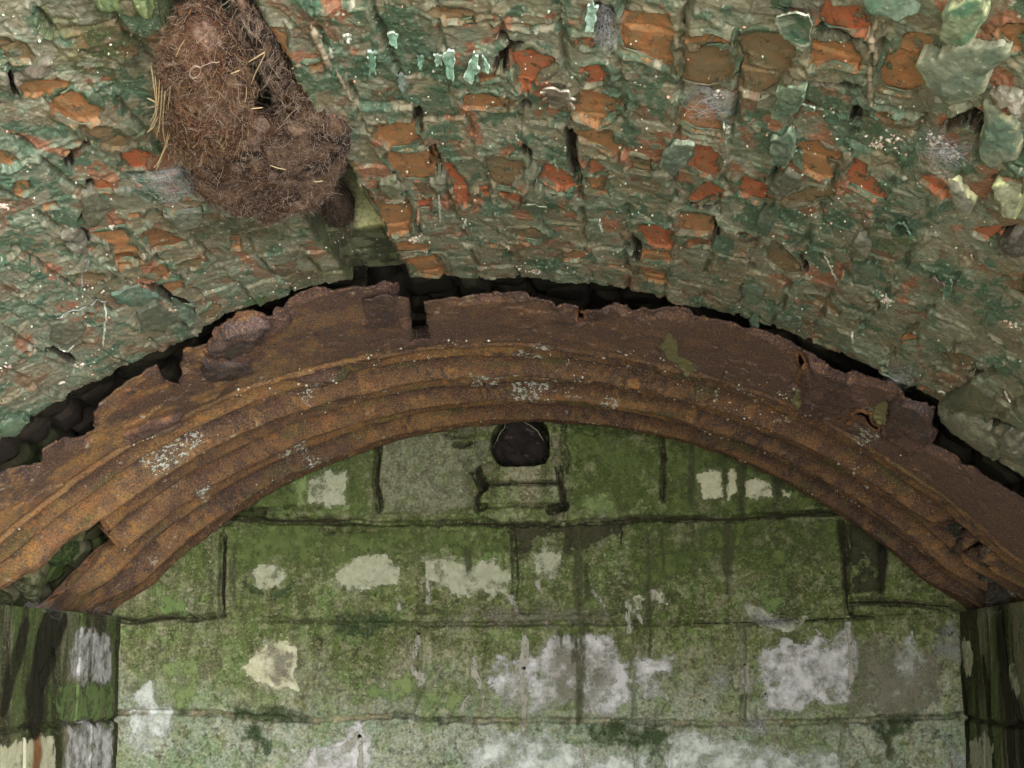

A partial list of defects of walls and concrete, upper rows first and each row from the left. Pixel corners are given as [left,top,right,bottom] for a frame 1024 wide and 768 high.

flaking render [0,33,35,68]
flaking render [991,23,1024,56]
flaking render [14,77,152,172]
flaking render [360,0,942,286]
flaking render [66,198,217,296]
crack [158,284,190,303]
crack [374,447,382,509]
leakage [335,554,400,593]
leakage [0,609,173,768]
leakage [243,637,300,692]
leakage [422,522,675,768]
leakage [740,603,943,715]